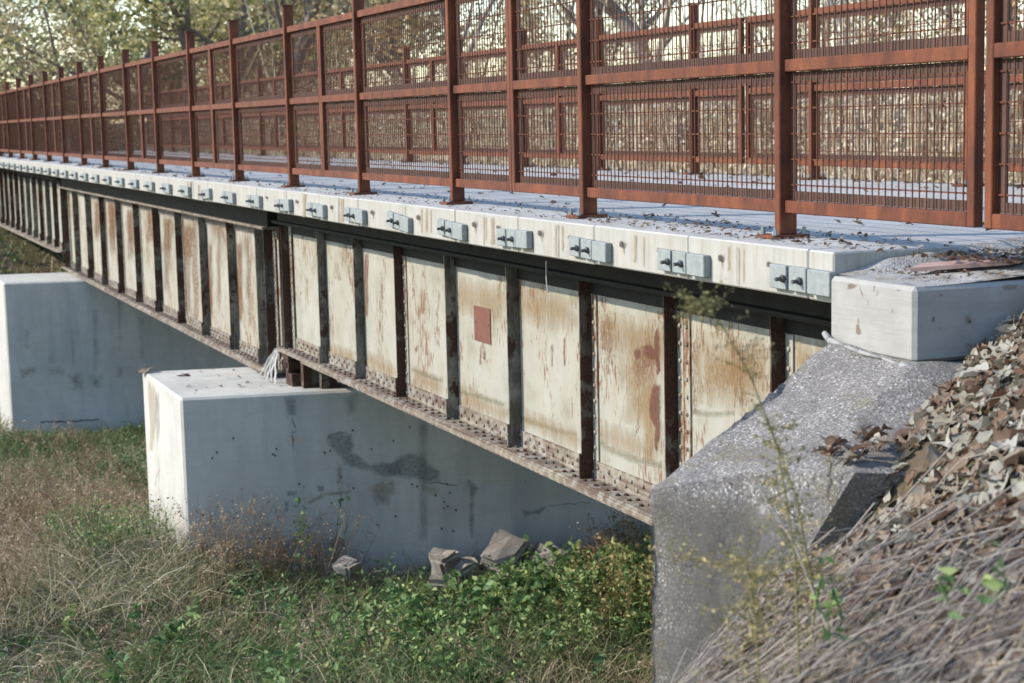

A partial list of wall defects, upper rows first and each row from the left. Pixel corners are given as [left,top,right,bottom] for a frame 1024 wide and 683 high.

rust [94,202,134,253]